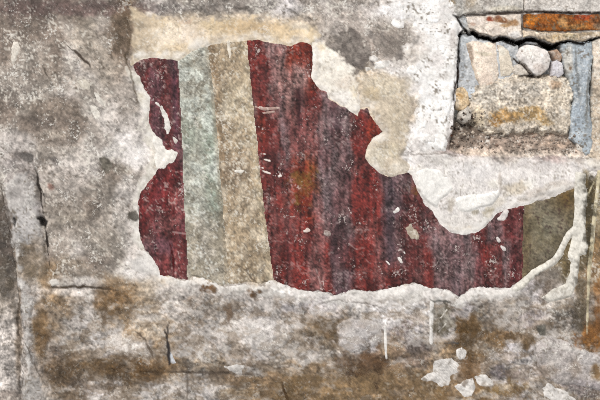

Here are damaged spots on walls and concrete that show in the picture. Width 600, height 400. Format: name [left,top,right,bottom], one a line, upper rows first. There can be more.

crack [453,11,600,100]
peeling [325,0,600,235]
crack [36,172,50,265]
crack [52,283,110,291]
crack [163,327,171,364]